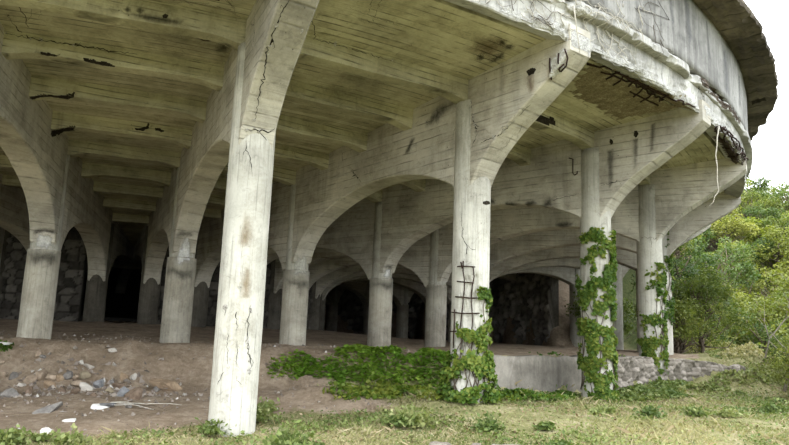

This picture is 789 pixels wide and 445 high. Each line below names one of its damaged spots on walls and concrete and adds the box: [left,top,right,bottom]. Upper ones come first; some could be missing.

crack [5,15,134,54]
spalling [83,58,115,67]
spalling [29,92,75,100]
crack [243,1,289,169]
spalling [500,6,752,165]
spalling [51,126,76,137]